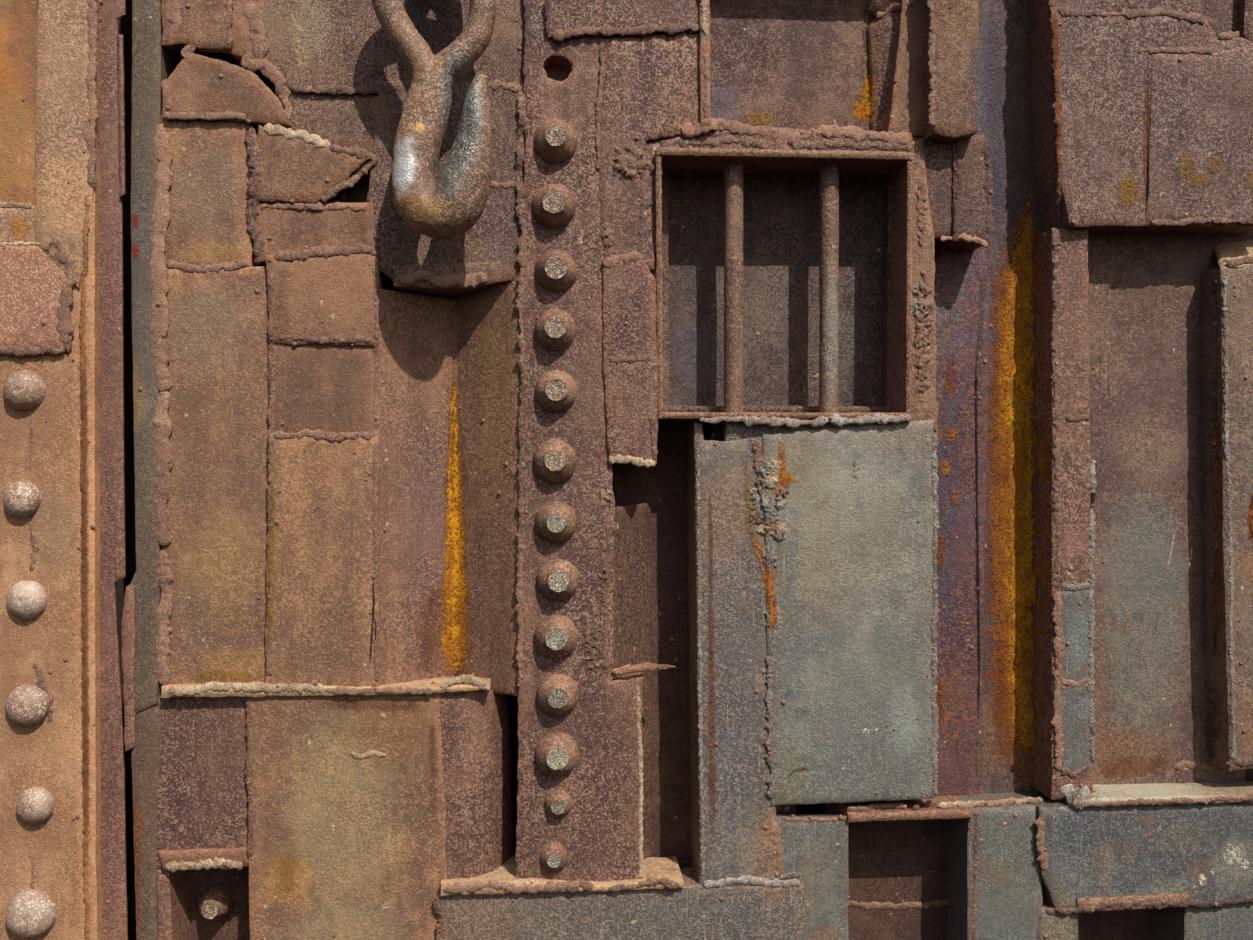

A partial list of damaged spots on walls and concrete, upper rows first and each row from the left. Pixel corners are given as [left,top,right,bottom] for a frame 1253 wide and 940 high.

rust [853,42,876,122]
rust [420,375,471,674]
rust [746,460,778,630]
rust [775,445,795,495]
rust [981,188,1052,788]